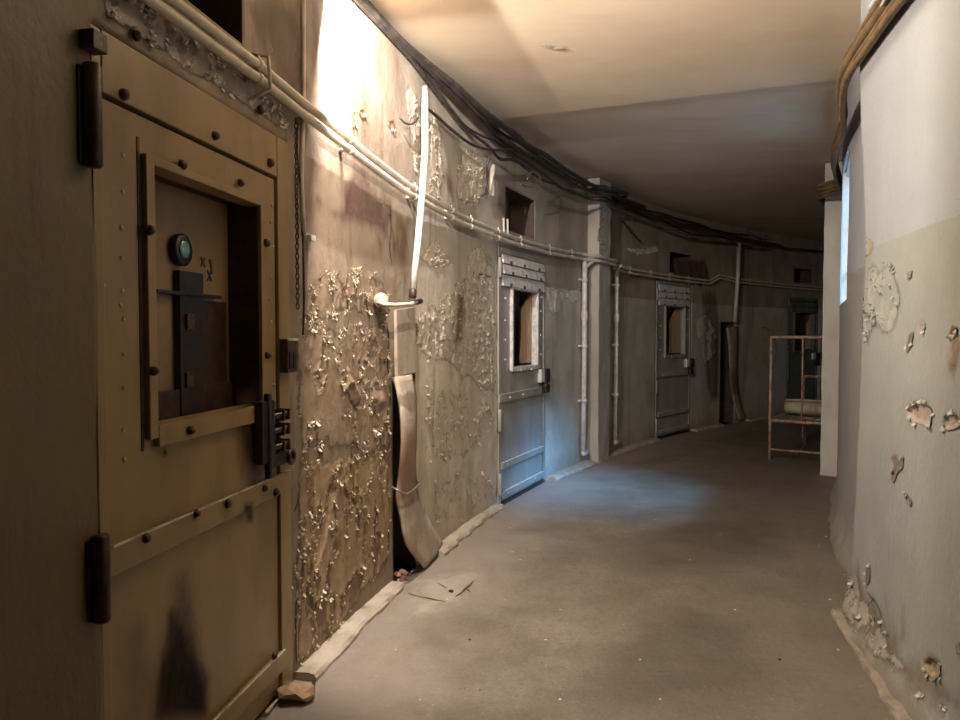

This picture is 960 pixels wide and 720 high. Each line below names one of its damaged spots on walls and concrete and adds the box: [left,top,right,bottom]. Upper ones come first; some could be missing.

peeling [104,0,290,130]
peeling [405,86,487,206]
peeling [421,241,450,267]
peeling [416,248,497,396]
peeling [860,261,912,343]
spalling [945,326,958,342]
spalling [905,399,960,432]
peeling [292,266,393,665]
spalling [890,453,903,483]
peeling [840,563,904,671]
spalling [921,657,941,683]